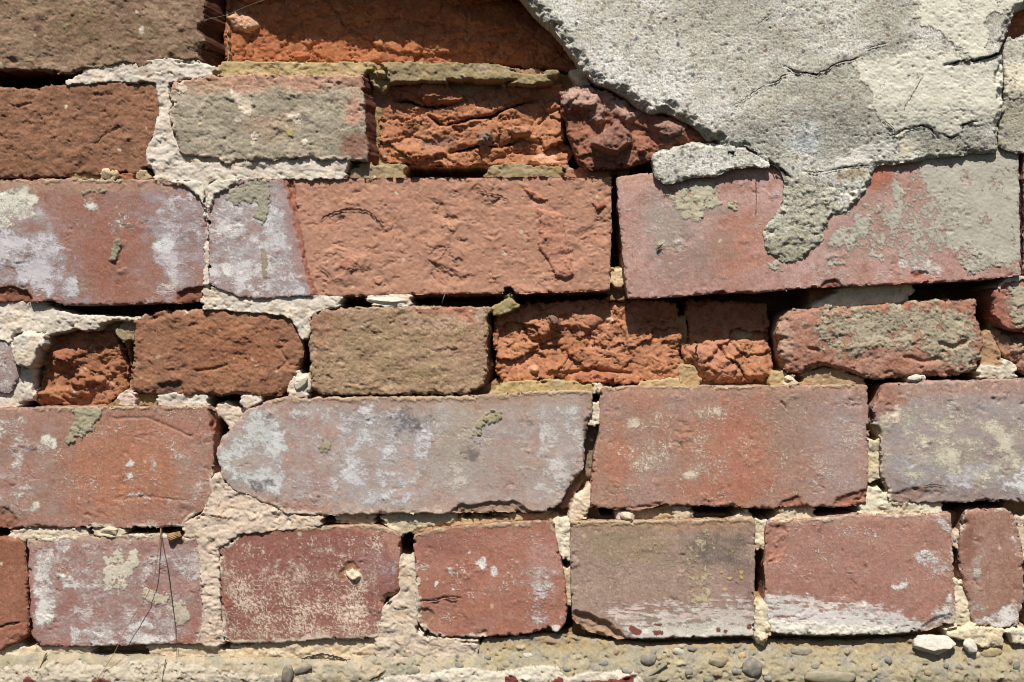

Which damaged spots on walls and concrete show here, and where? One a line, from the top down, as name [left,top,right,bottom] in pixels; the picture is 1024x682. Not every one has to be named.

crack [734,43,886,105]
crack [884,77,976,139]
crack [945,37,1006,98]
leakage [0,185,88,303]
leakage [84,181,309,304]
peeling [224,0,1024,384]
spalling [37,331,128,406]
leakage [0,401,585,521]
leakage [30,538,200,647]